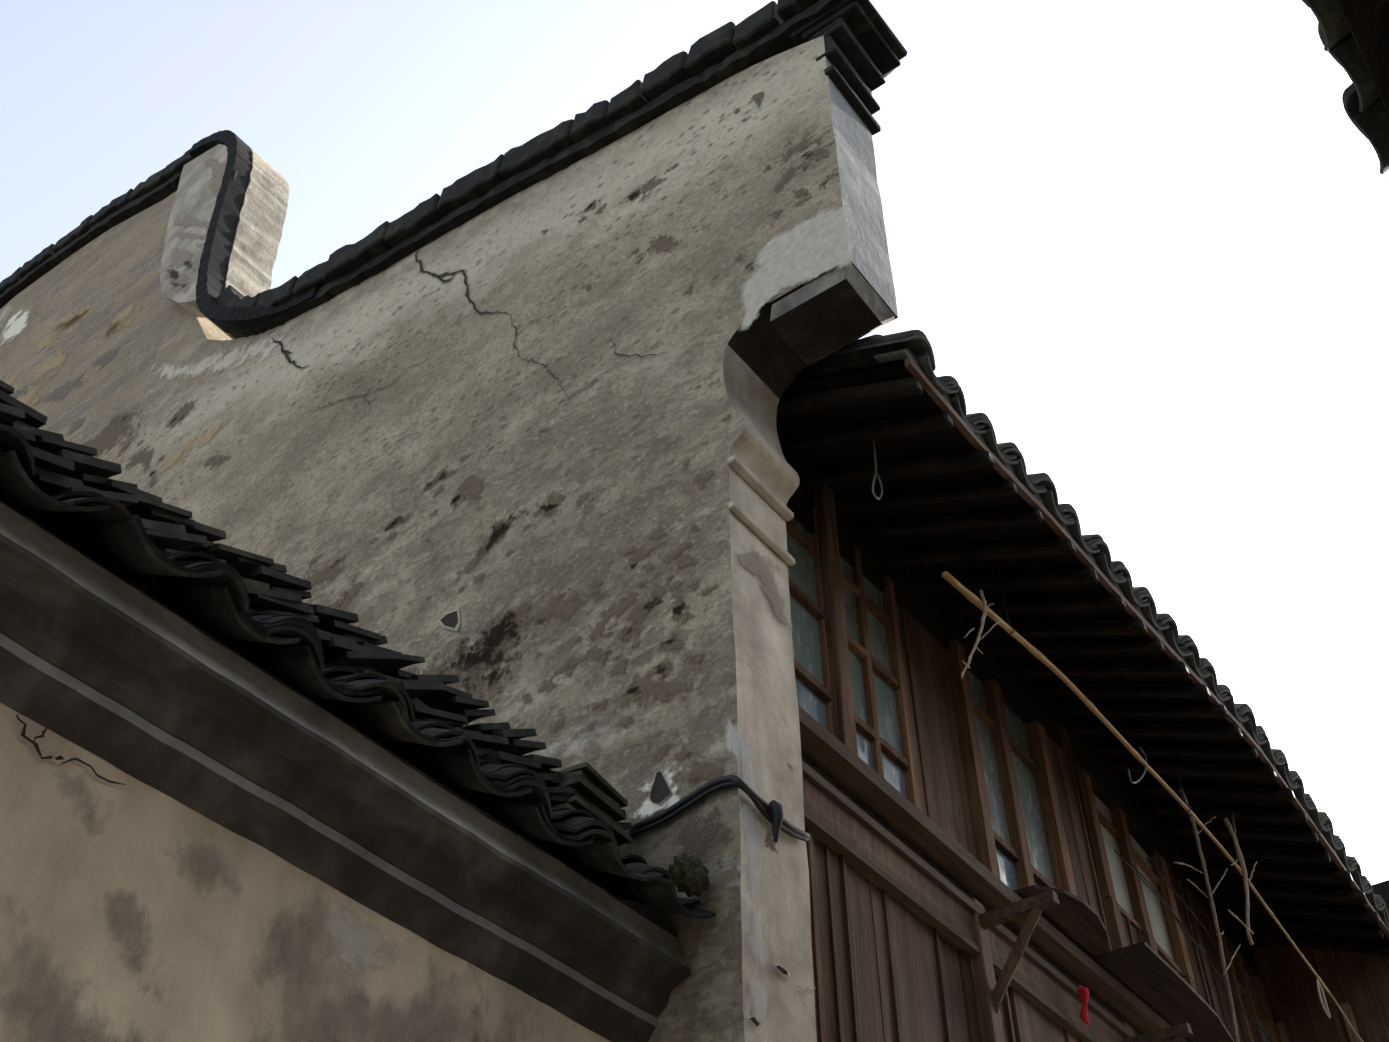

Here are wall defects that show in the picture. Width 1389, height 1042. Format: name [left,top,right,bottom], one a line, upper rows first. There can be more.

crack [272,338,309,368]
crack [415,249,664,395]
leakage [304,555,364,611]
spalling [438,608,461,631]
leakage [402,517,718,731]
crack [16,714,126,785]
peeling [634,767,679,819]
leakage [12,950,138,1042]
leakage [268,917,478,1042]